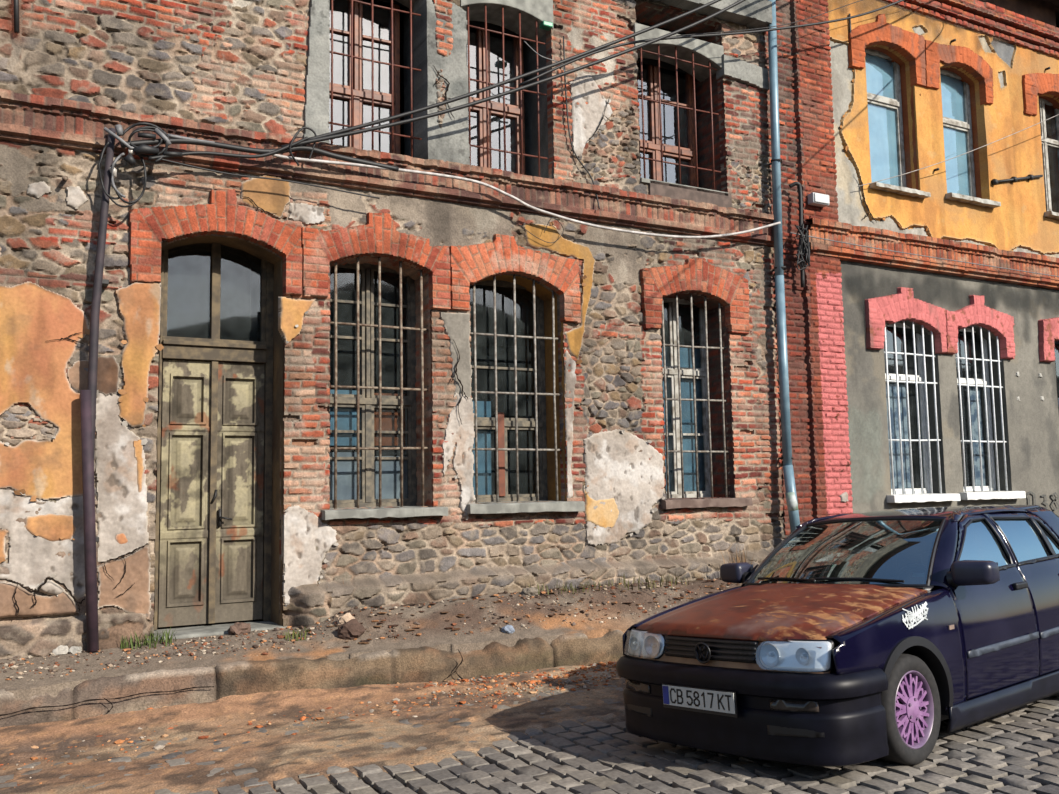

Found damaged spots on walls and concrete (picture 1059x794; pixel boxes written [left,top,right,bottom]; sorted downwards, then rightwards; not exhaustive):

spalling [978,36,1014,88]
crack [434,66,455,121]
peeling [569,73,613,158]
spalling [829,40,928,236]
peeling [240,175,325,225]
crack [45,332,85,345]
crack [451,340,468,424]
peeling [522,222,665,546]
peeling [0,282,164,599]
crack [0,577,85,616]
crack [99,544,148,597]
crack [0,686,214,716]